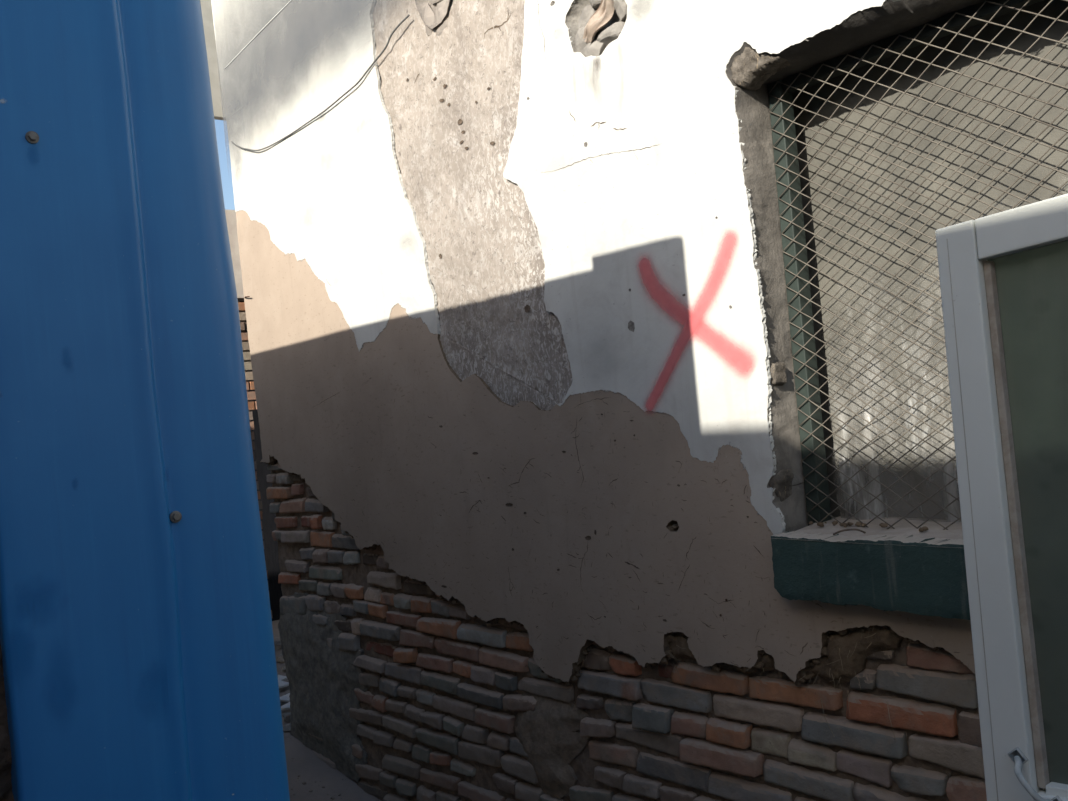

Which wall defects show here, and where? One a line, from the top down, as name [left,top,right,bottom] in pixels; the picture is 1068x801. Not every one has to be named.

crack [541,110,662,174]
crack [340,393,811,671]
flaking render [236,0,987,801]